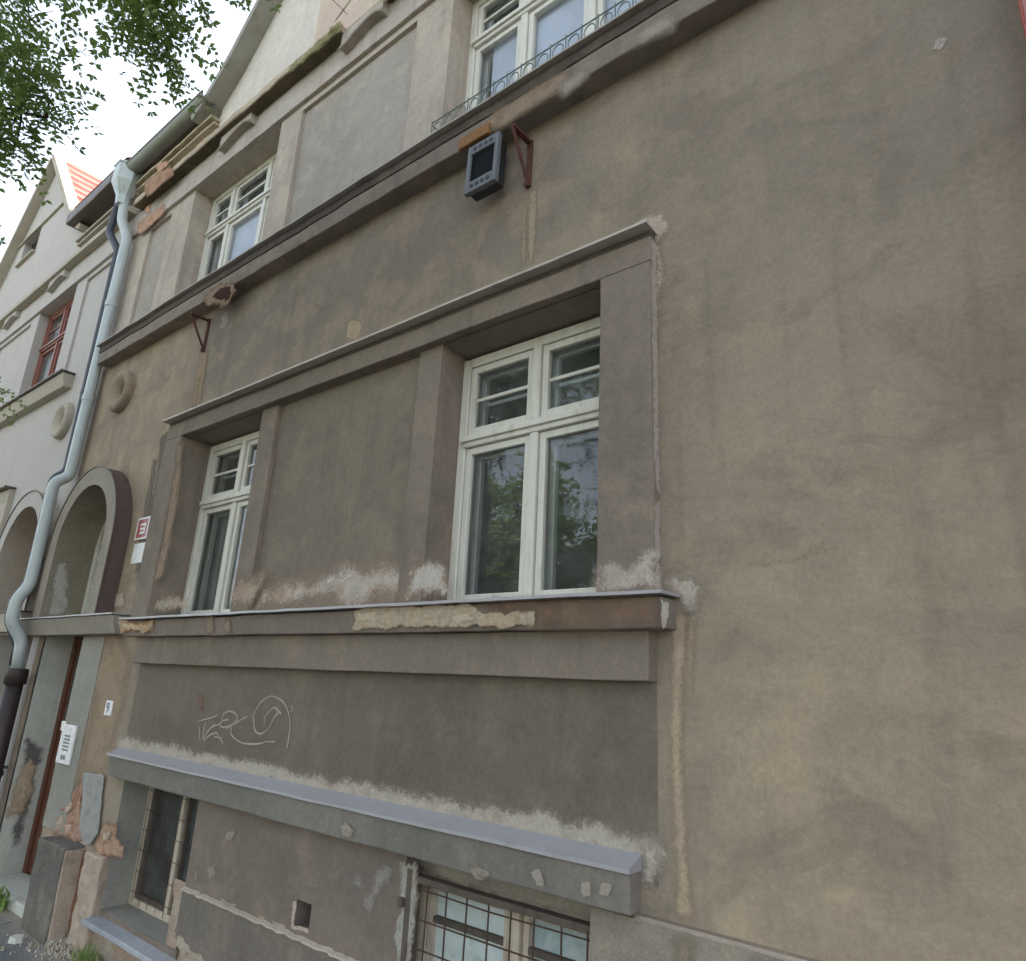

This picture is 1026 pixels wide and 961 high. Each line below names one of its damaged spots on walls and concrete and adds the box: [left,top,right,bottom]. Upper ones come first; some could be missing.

flaking render [137,160,174,234]
flaking render [203,283,236,308]
flaking render [351,603,535,631]
flaking render [5,739,41,843]
flaking render [52,781,124,930]
flaking render [175,891,340,961]
peeling [393,861,418,961]